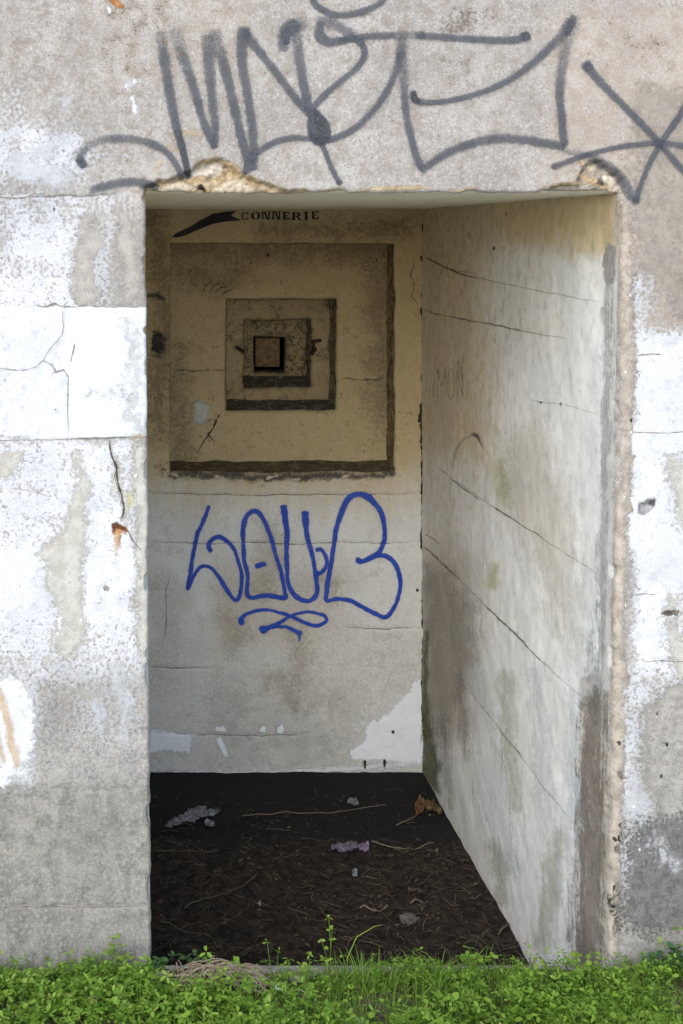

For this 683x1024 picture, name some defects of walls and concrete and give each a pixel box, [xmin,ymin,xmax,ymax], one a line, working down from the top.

spalling [141,157,340,203]
crack [0,302,454,574]
rust [112,523,127,550]
peeling [544,83,683,958]
peeling [149,729,193,755]
crack [348,600,423,738]
peeling [349,677,423,768]
water stain [568,687,683,966]